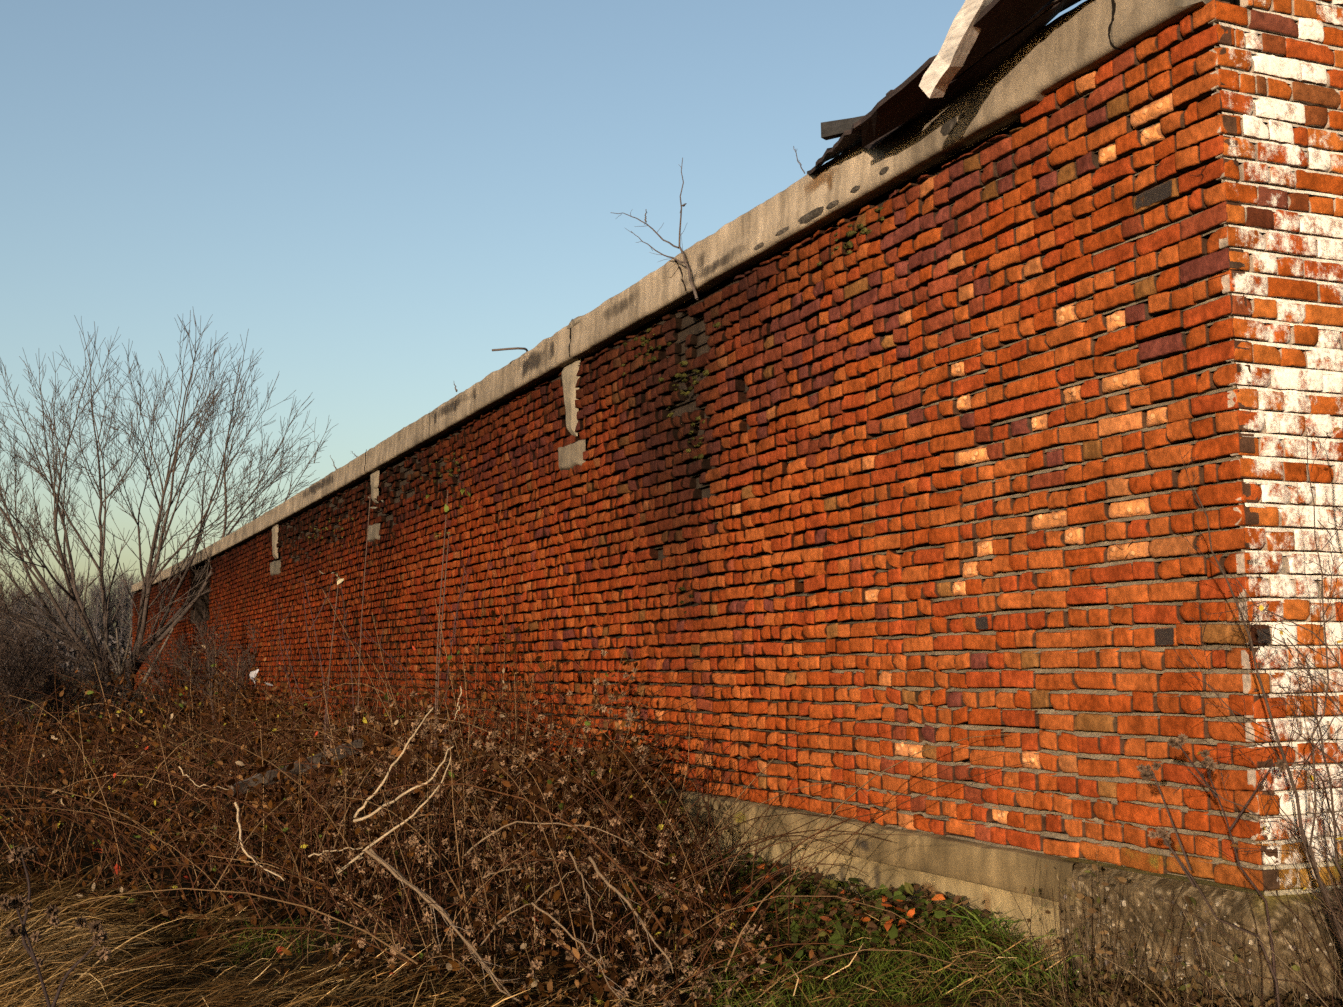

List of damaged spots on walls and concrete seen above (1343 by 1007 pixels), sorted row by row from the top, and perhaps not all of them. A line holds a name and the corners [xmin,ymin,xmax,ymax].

crack [1108,0,1118,50]